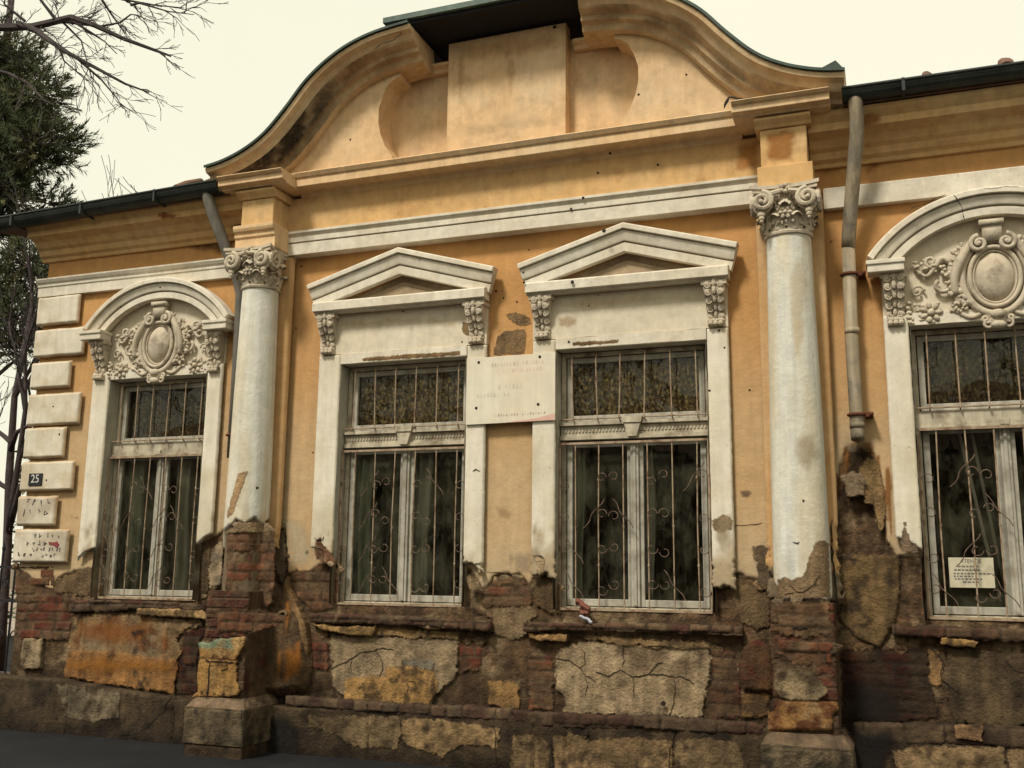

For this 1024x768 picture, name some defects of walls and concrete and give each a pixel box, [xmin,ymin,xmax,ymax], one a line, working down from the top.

damp [233,87,335,174]
peeling [494,290,531,356]
peeling [712,515,733,532]
flaking render [11,563,96,640]
flaking render [175,471,346,694]
crack [333,648,393,675]
flaking render [459,556,565,672]
flaking render [752,540,939,723]
crack [556,645,694,768]